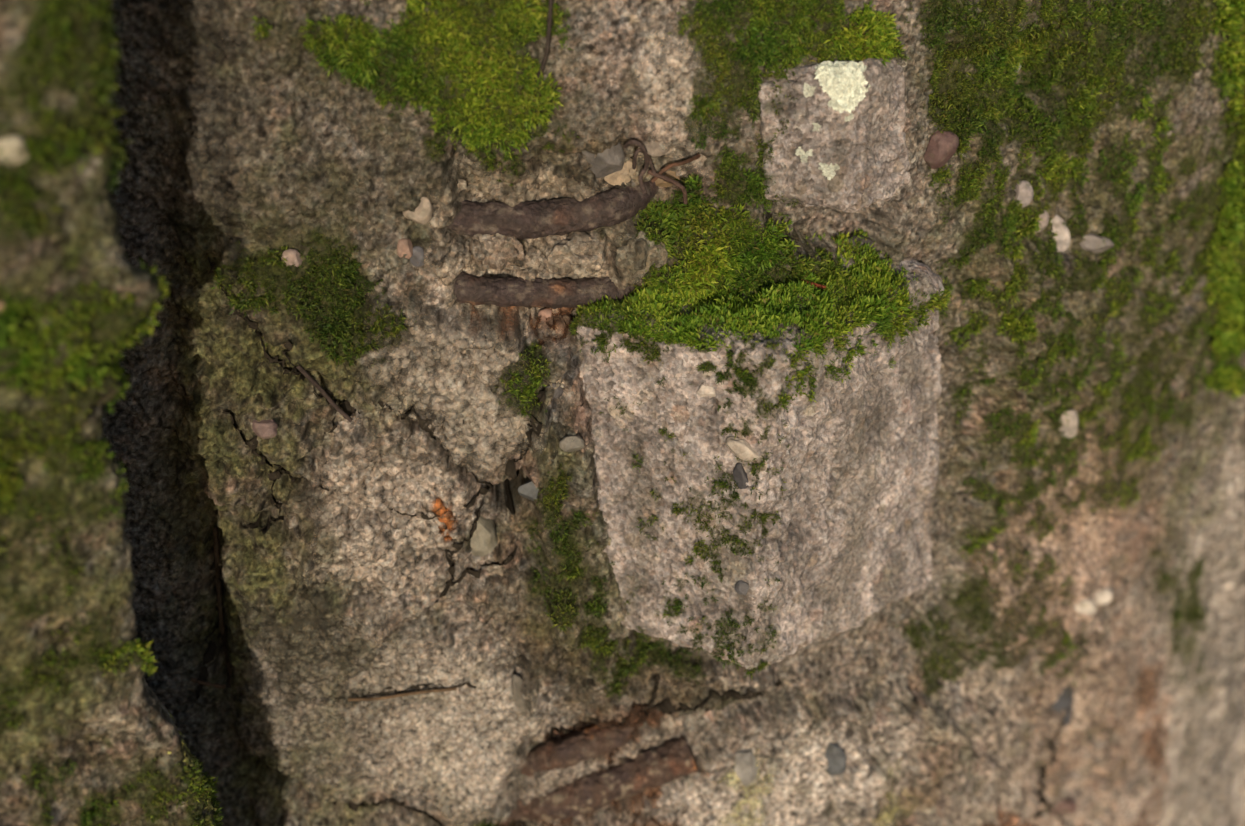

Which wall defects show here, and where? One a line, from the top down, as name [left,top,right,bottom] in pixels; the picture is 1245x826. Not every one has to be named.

spalling [426,153,659,339]
spalling [495,709,709,826]
rust [546,705,665,743]